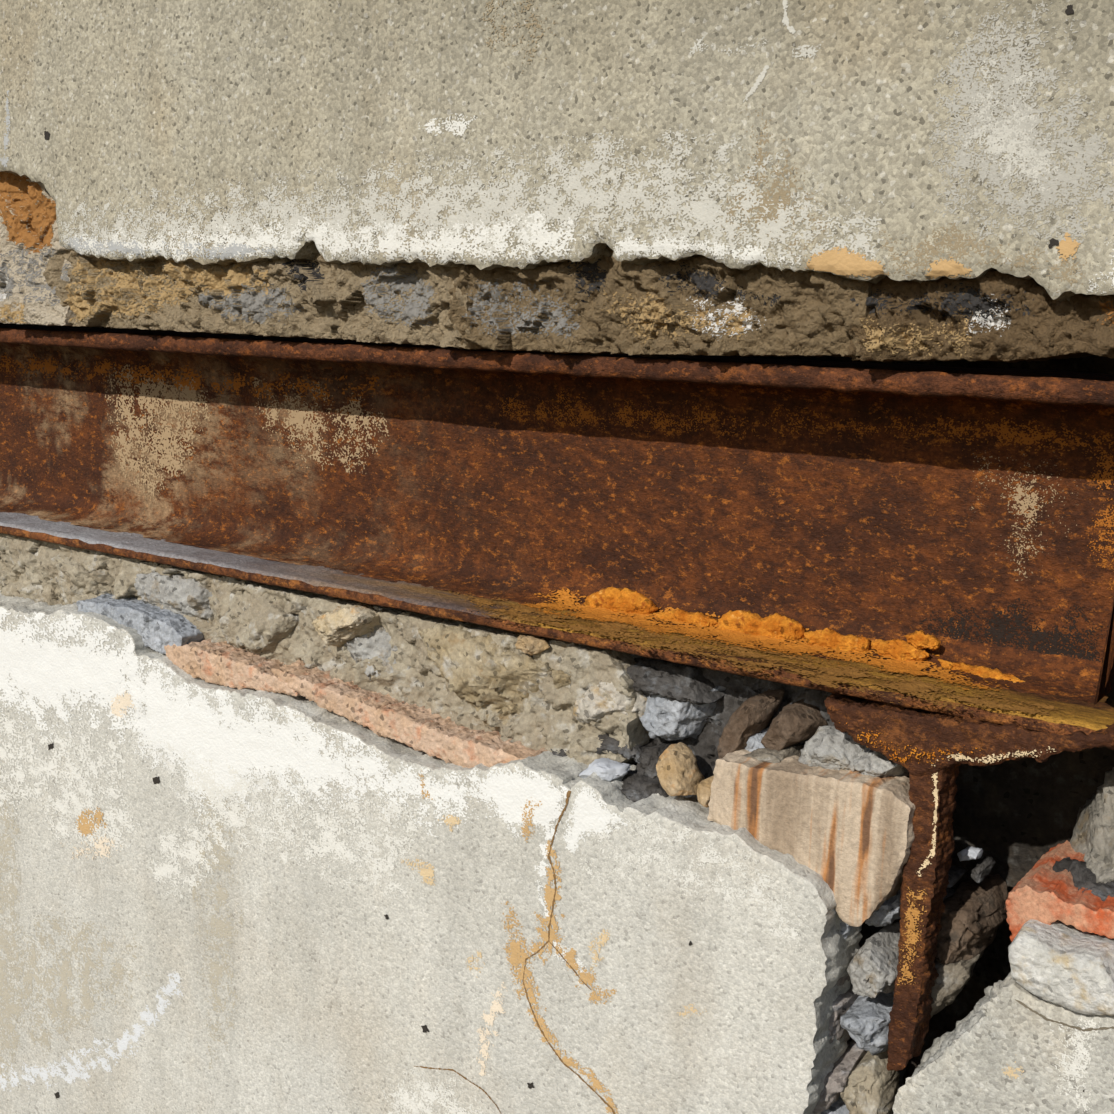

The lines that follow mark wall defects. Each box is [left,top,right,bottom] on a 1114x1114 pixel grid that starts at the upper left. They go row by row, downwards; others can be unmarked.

water stain [0,0,1114,339]
spalling [0,177,1114,364]
rust [601,285,753,344]
rust [860,315,992,358]
rust [498,391,1114,590]
rust [0,526,1095,735]
peeling [0,607,632,899]
rust [846,723,984,764]
water stain [0,713,425,1092]
crack [522,790,615,1114]
rust [896,887,927,986]
spalling [892,972,1114,1114]